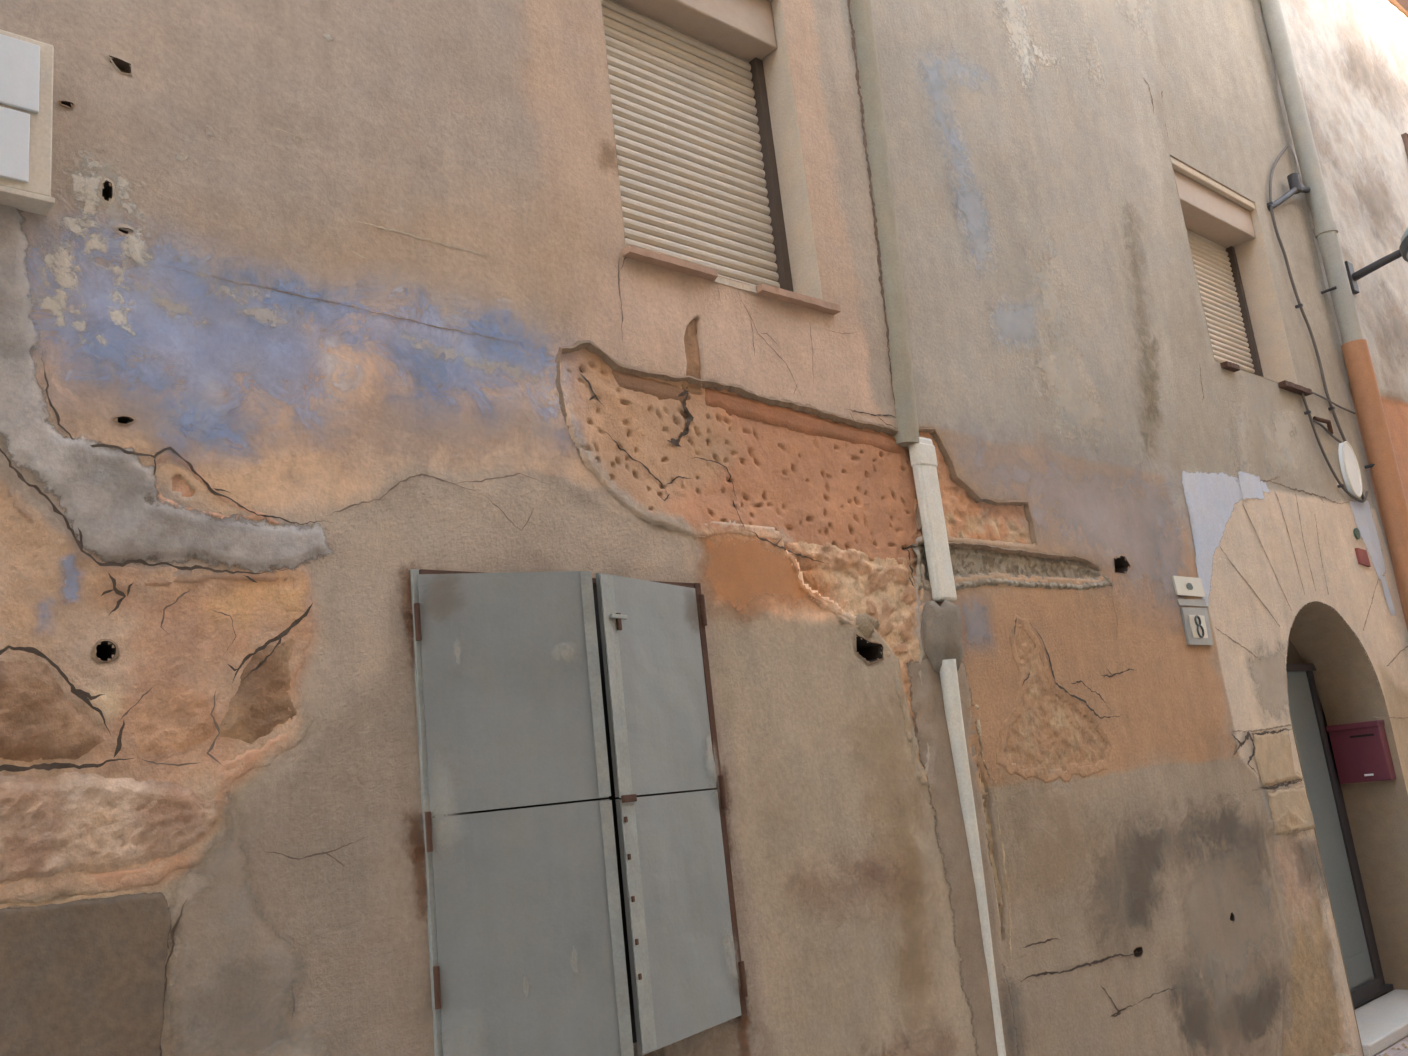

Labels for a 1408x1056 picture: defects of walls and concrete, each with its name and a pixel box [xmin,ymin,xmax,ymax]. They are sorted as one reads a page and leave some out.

peeling [995,0,1060,97]
peeling [39,160,152,345]
spalling [111,415,137,426]
crack [149,257,824,563]
spalling [350,296,1131,591]
spalling [0,452,316,904]
hole [854,632,884,666]
spalling [971,614,1115,969]
crack [1020,938,1175,1017]
damp [1184,833,1274,1008]